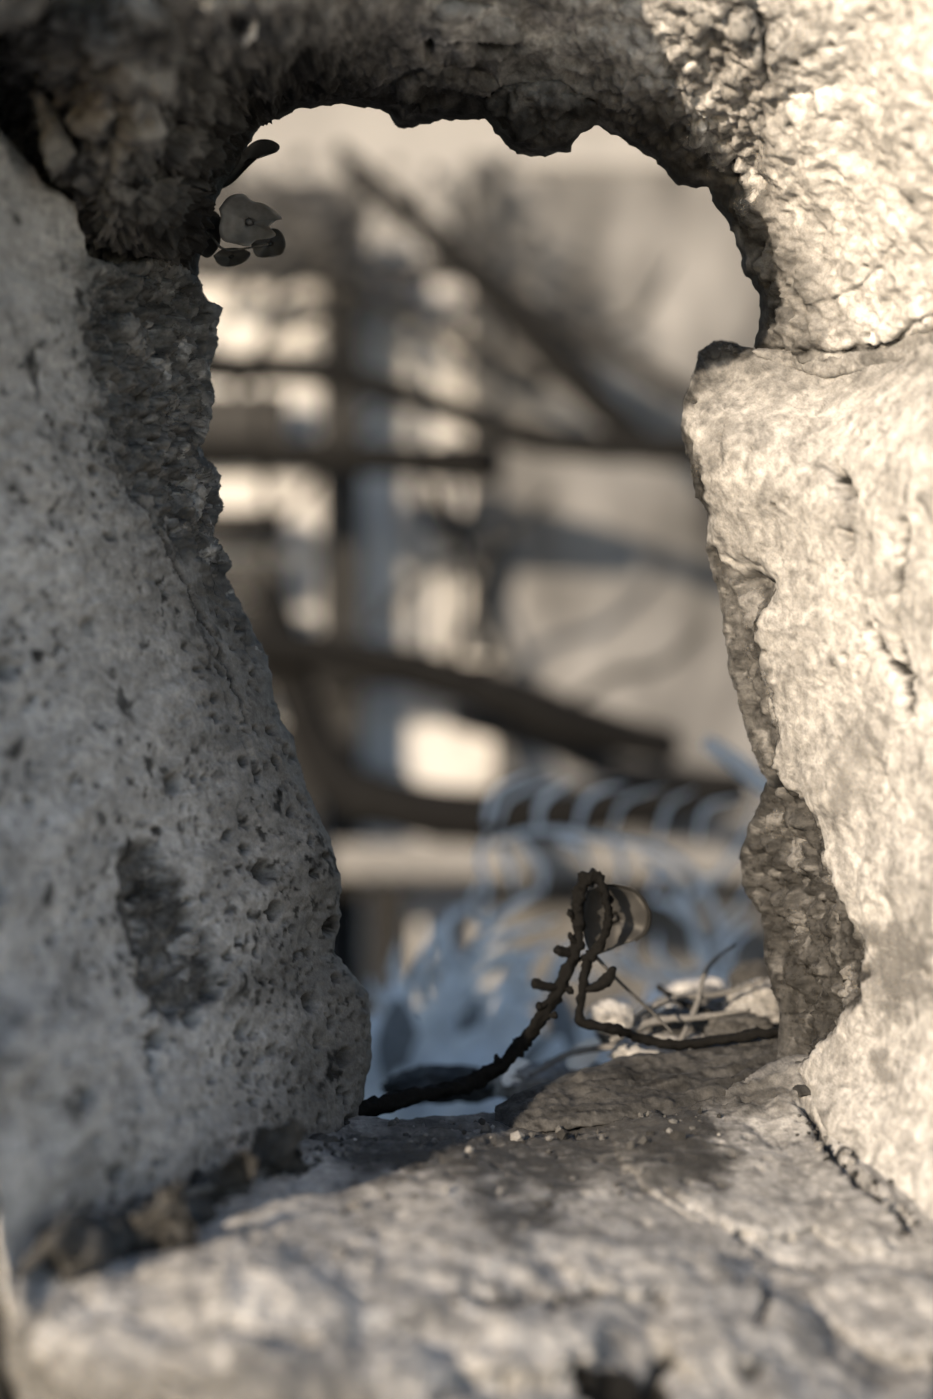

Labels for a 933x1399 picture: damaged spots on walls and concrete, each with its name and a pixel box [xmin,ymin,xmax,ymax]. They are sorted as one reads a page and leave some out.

peeling [652,0,813,204]
spalling [683,340,754,405]
spalling [681,429,708,515]
crack [881,638,917,711]
spalling [705,543,871,1062]